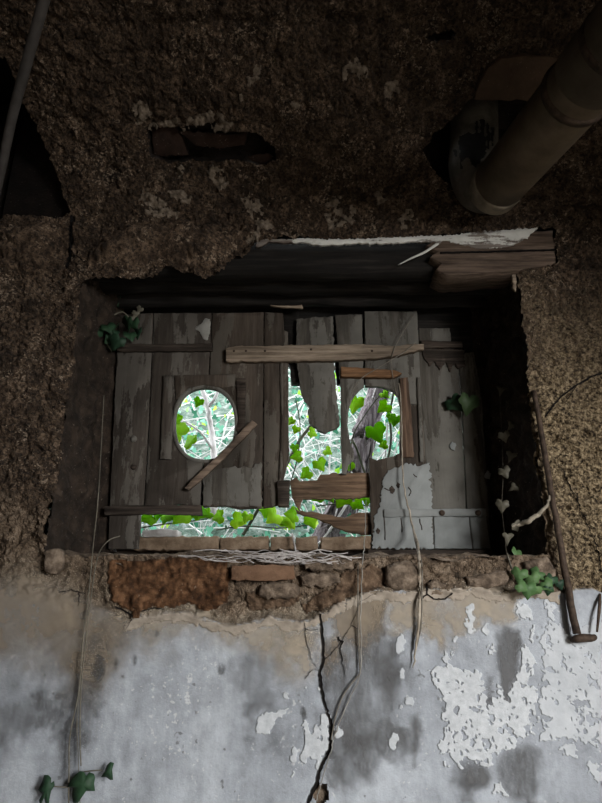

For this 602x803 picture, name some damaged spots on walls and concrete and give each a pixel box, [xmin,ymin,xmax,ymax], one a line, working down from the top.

spalling [131,100,277,191]
crack [303,593,376,803]
peeling [107,556,602,784]
damp [324,586,520,777]
damp [461,765,490,789]
peeling [492,781,509,797]
damp [506,750,535,797]